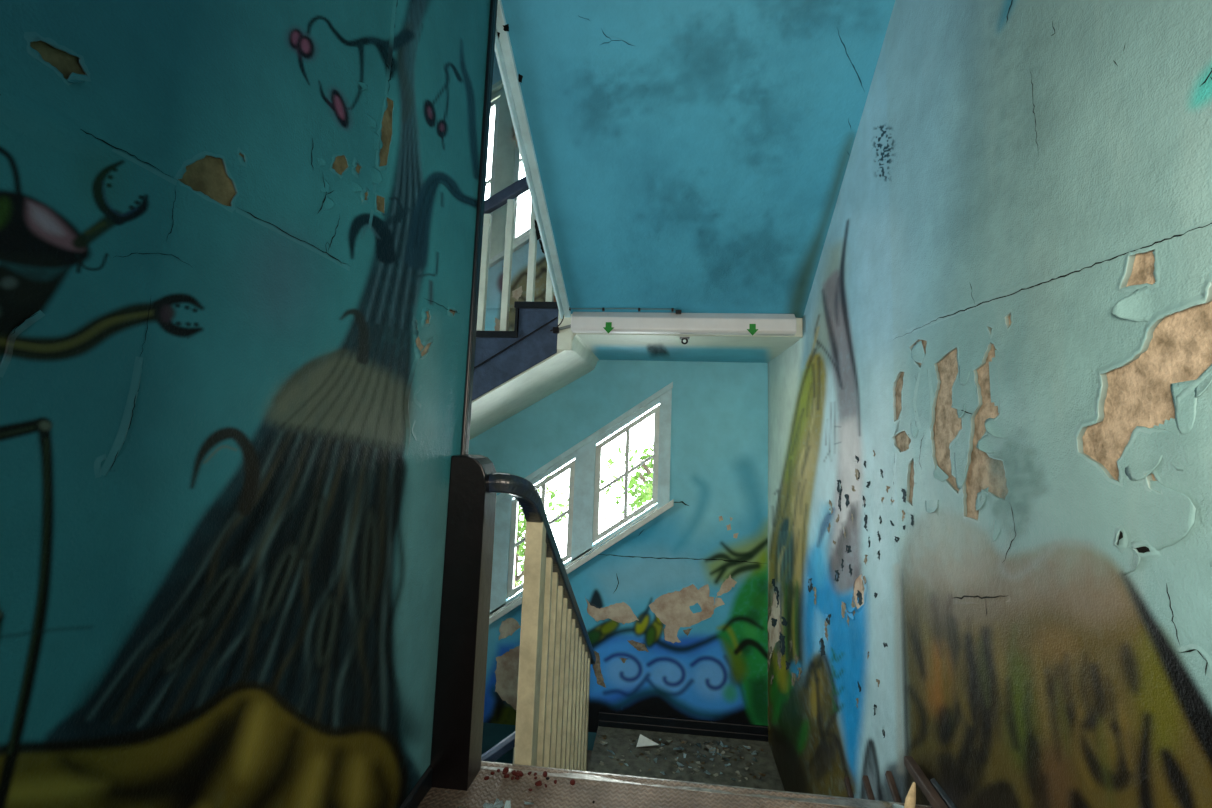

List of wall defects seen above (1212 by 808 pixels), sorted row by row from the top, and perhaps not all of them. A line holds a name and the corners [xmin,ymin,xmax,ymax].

peeling [24,32,92,86]
crack [81,129,191,266]
peeling [174,147,248,213]
water stain [874,126,893,179]
crack [892,220,1212,341]
peeling [1073,245,1212,575]
peeling [808,309,1014,656]
peeling [591,650,607,689]
peeling [584,574,739,664]
peeling [767,579,802,687]